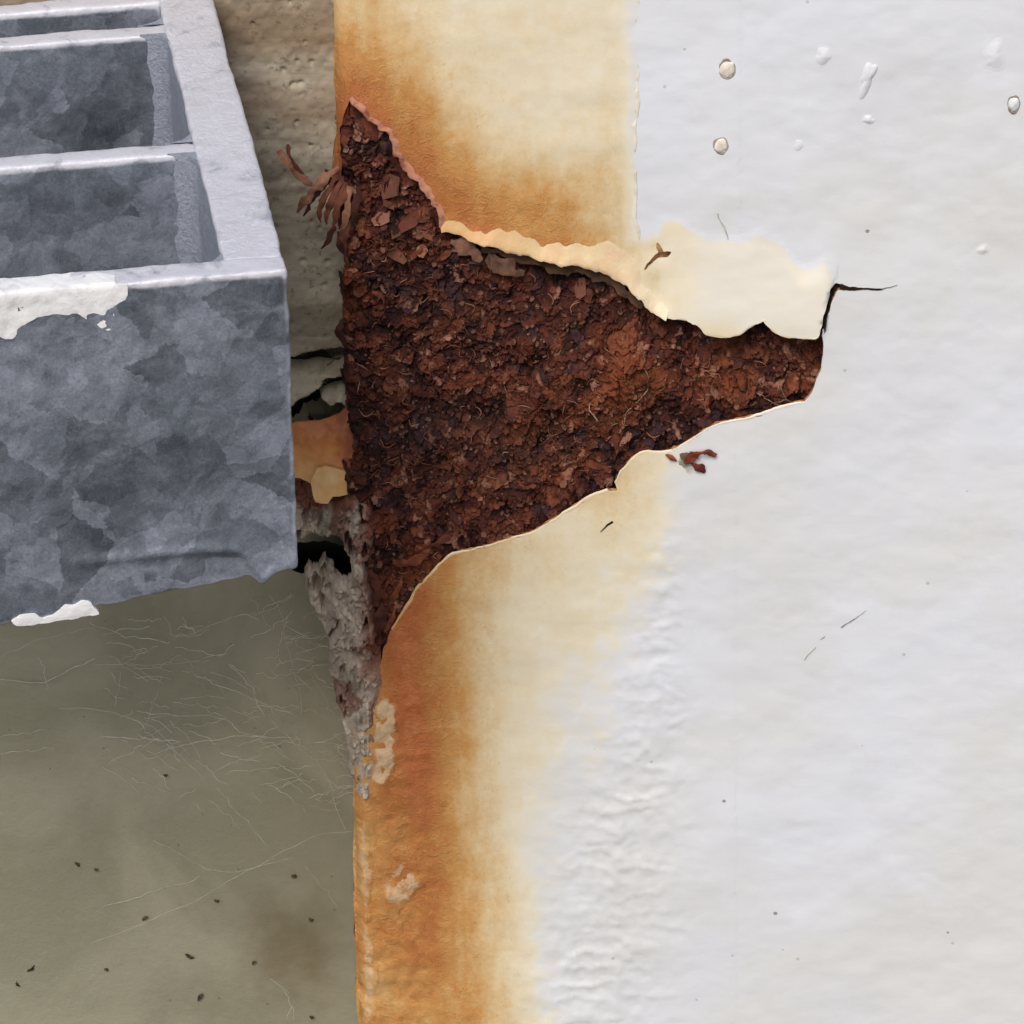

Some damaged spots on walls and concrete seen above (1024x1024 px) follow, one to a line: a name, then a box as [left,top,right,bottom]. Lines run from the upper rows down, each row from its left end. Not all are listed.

rust [331,0,742,294]
spalling [276,96,823,658]
crack [821,283,897,333]
peeling [367,693,398,788]